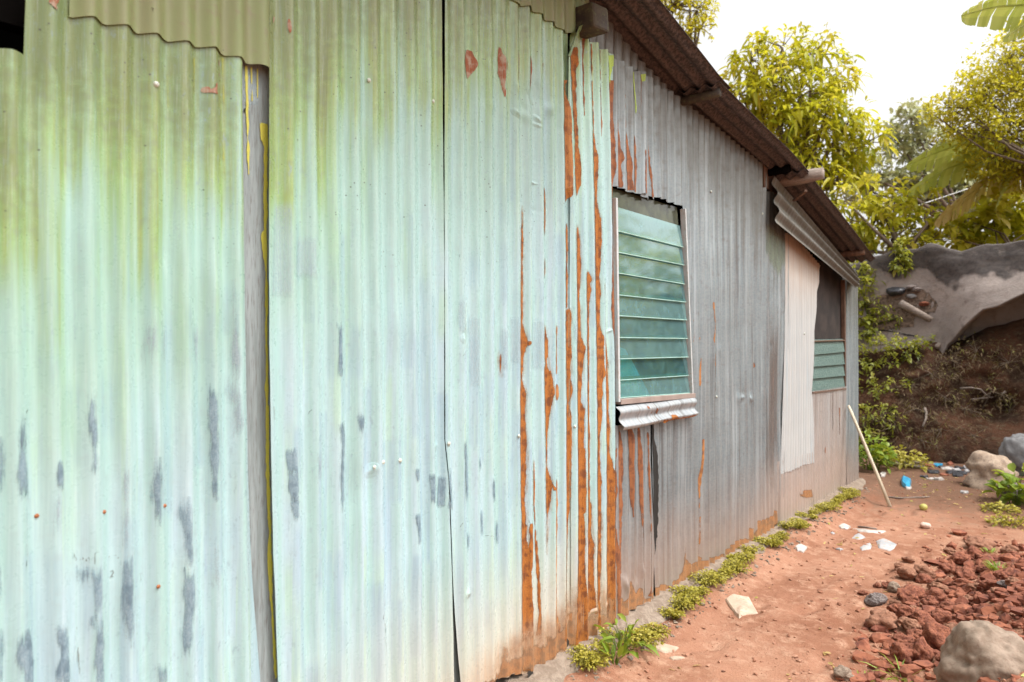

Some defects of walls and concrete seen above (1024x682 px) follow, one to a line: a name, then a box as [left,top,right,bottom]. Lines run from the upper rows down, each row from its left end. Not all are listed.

corrosion [485,38,778,682]